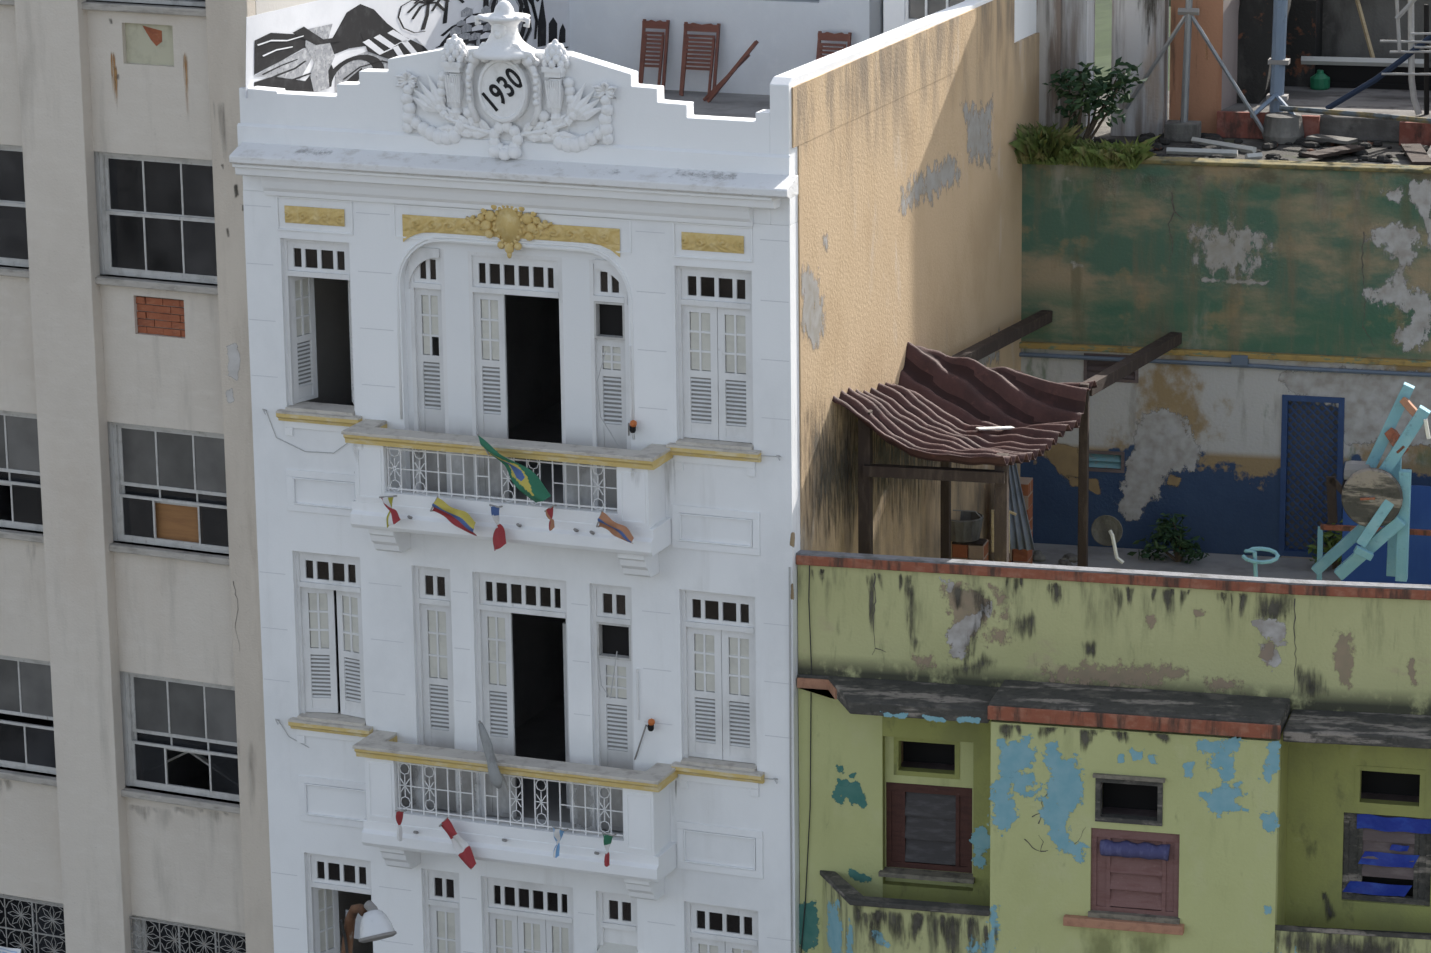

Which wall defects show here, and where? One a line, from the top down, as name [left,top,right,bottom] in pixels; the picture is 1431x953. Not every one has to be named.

spalling [1188,221,1273,285]
spalling [1362,179,1431,352]
spalling [1278,366,1431,448]
water stain [869,574,880,623]
water stain [899,574,916,648]
water stain [954,588,989,618]
water stain [1151,589,1190,610]
water stain [1221,593,1286,619]
water stain [1297,668,1321,697]
peeling [832,764,868,809]
peeling [969,734,1091,869]
peeling [1182,737,1281,833]